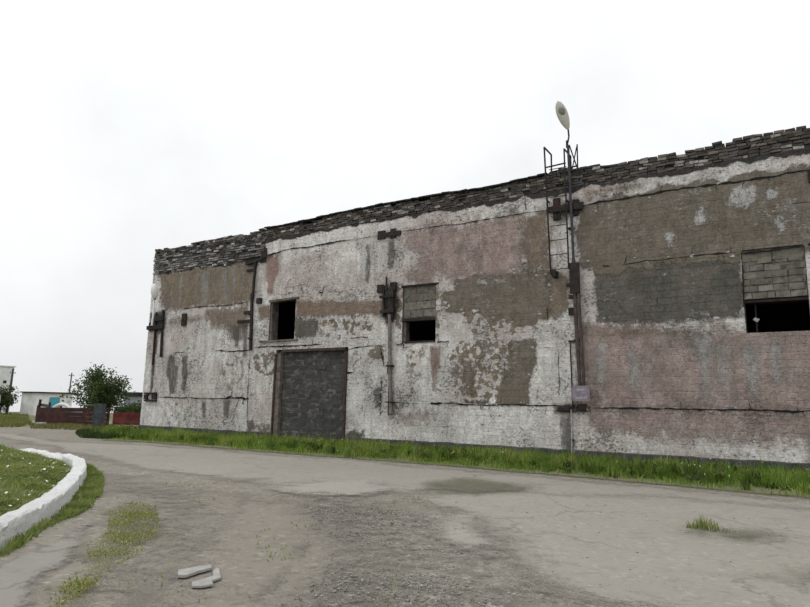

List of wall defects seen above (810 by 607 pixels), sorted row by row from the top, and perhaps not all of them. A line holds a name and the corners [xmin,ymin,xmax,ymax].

crack [584,168,808,208]
flaking render [153,147,810,329]
crack [587,243,810,320]
water stain [167,355,187,394]
water stain [206,304,248,381]
crack [163,342,320,413]
flaking render [294,314,373,340]
crack [347,337,560,416]
flaking render [436,269,553,407]
crack [602,402,810,419]